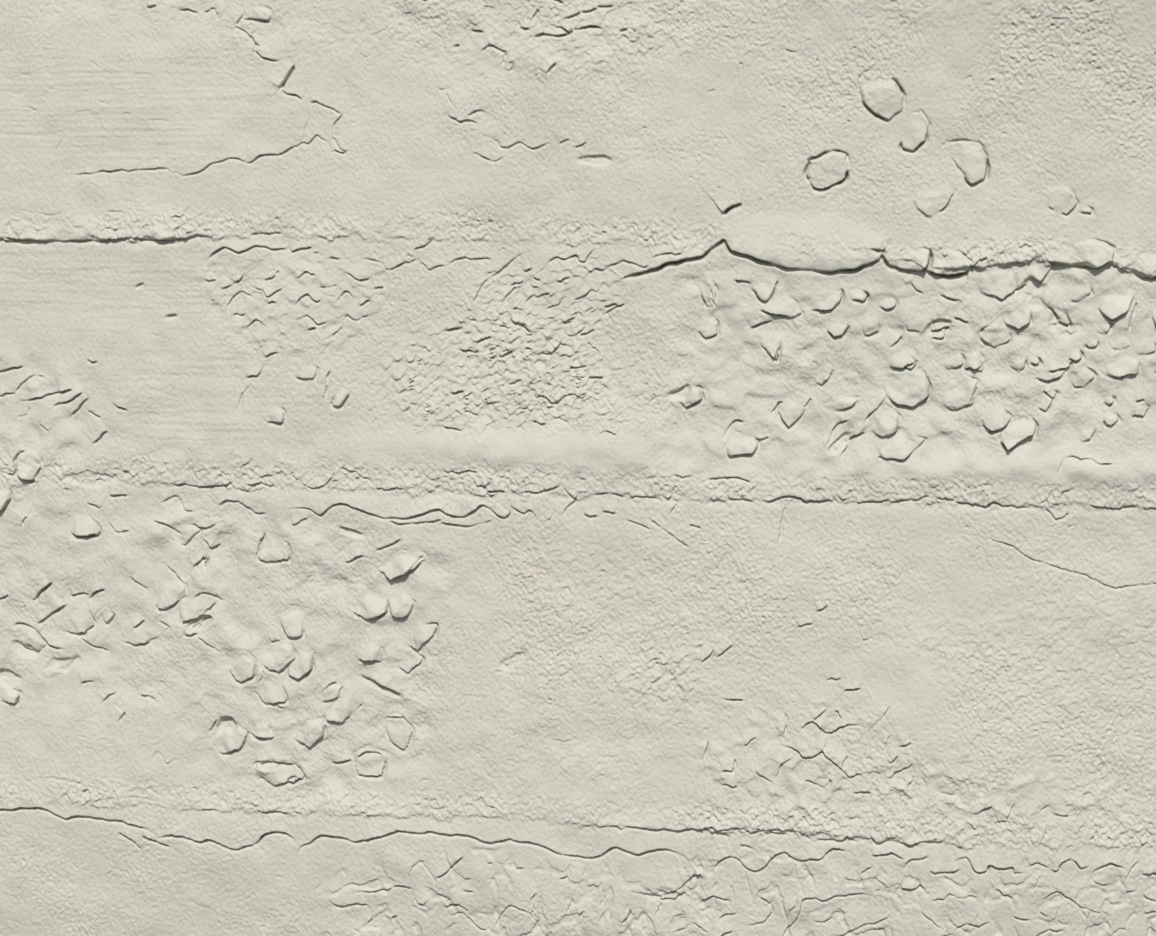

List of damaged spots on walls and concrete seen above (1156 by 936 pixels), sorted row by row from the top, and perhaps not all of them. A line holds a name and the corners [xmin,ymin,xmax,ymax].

crack [52,0,349,181]
flaking render [857,69,931,154]
flaking render [804,150,851,193]
flaking render [904,139,991,221]
crack [0,229,315,264]
crack [361,201,968,309]
spalling [199,245,1156,476]
spalling [0,353,454,799]
crack [170,453,1156,593]
crack [0,805,1156,904]